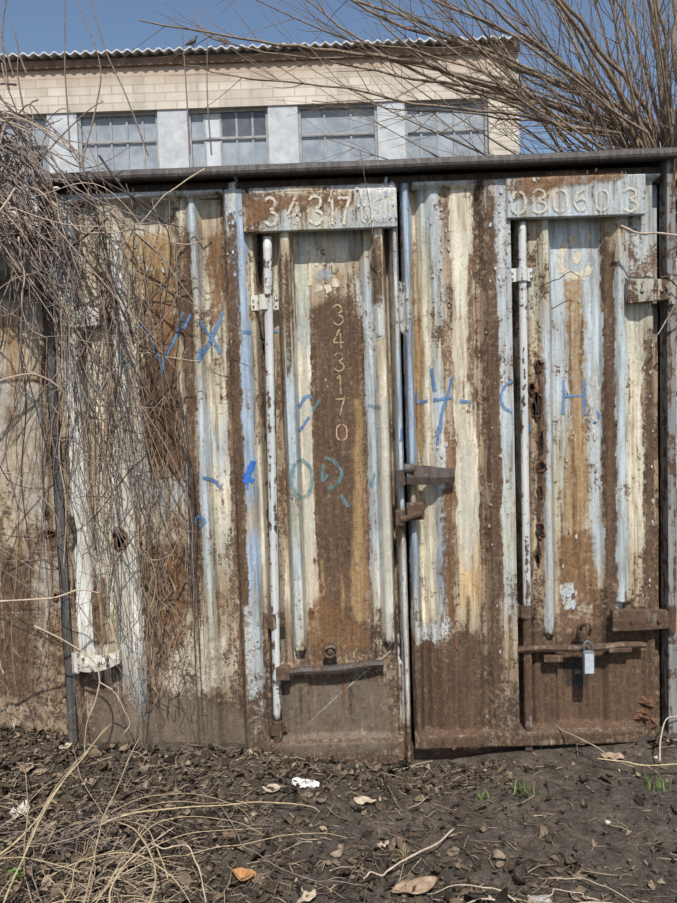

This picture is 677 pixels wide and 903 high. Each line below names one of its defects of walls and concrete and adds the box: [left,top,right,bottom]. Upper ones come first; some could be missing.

corrosion [513,168,627,200]
corrosion [0,517,54,697]
corrosion [37,330,53,528]
corrosion [125,233,201,699]
corrosion [207,195,353,713]
corrosion [284,297,392,755]
corrosion [409,192,512,750]
corrosion [532,238,656,747]